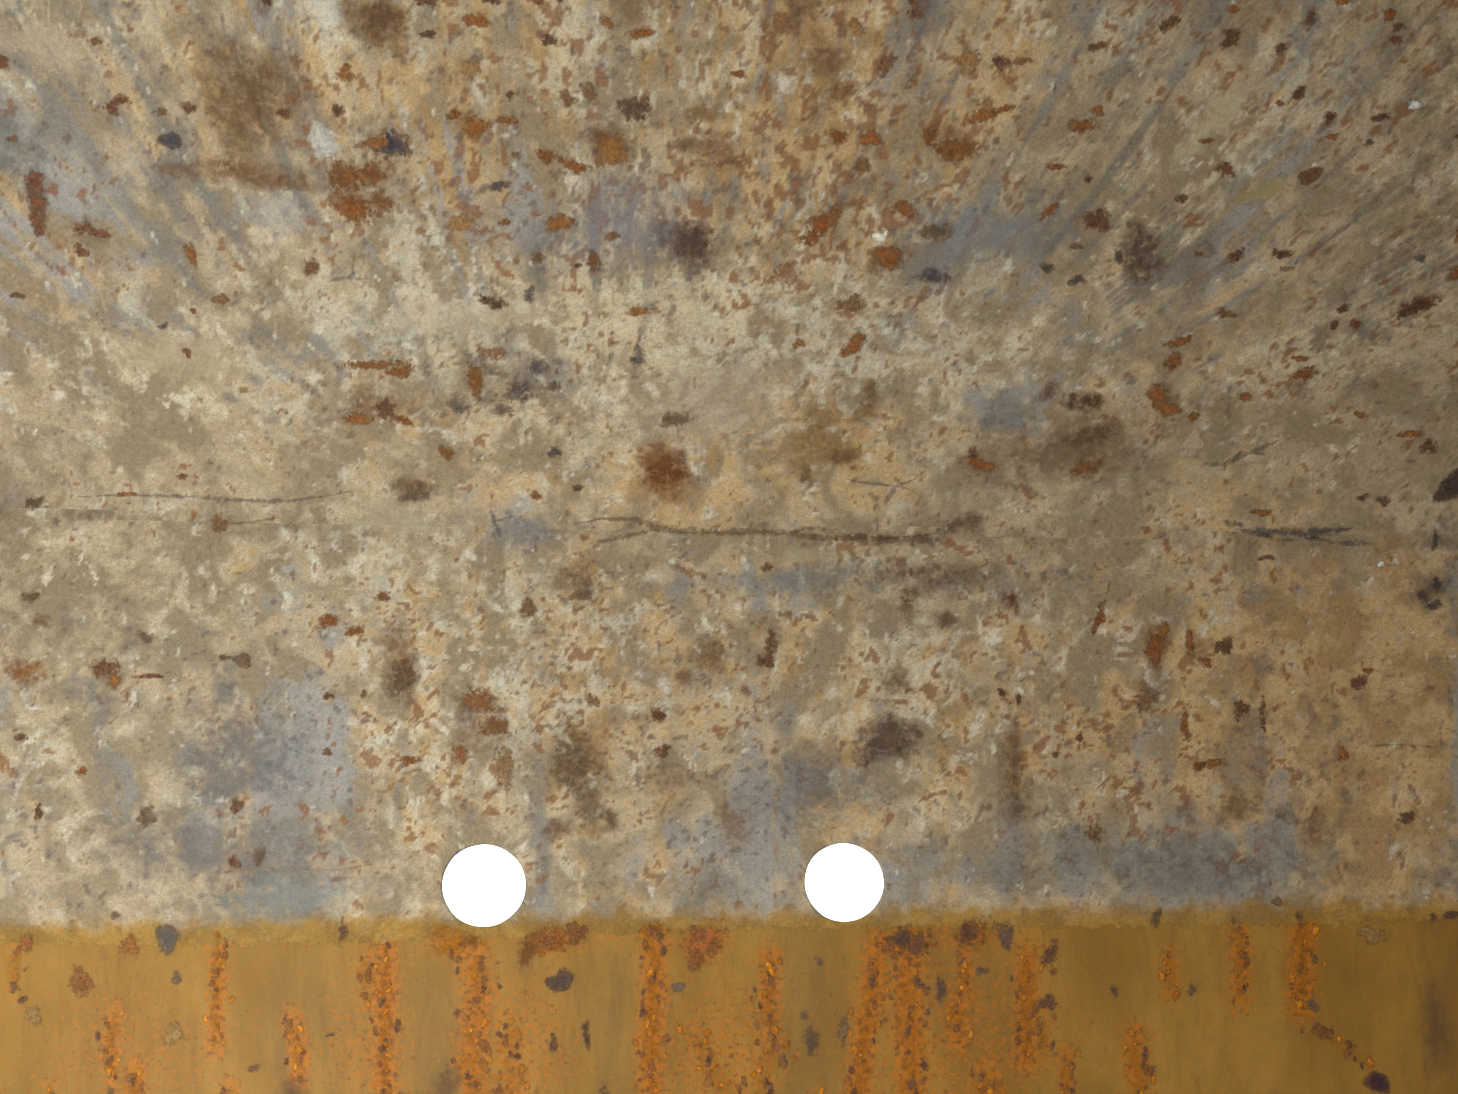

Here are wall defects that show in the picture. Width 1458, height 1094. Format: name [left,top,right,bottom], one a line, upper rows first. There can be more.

corrosion [511,96,652,176]
corrosion [326,128,413,225]
corrosion [24,171,49,237]
corrosion [479,286,534,310]
corrosion [839,332,865,358]
corrosion [341,359,415,379]
corrosion [342,397,413,426]
corrosion [319,614,364,636]
corrosion [755,628,778,668]
corrosion [1143,621,1233,668]
corrosion [93,658,163,688]
corrosion [461,689,514,791]